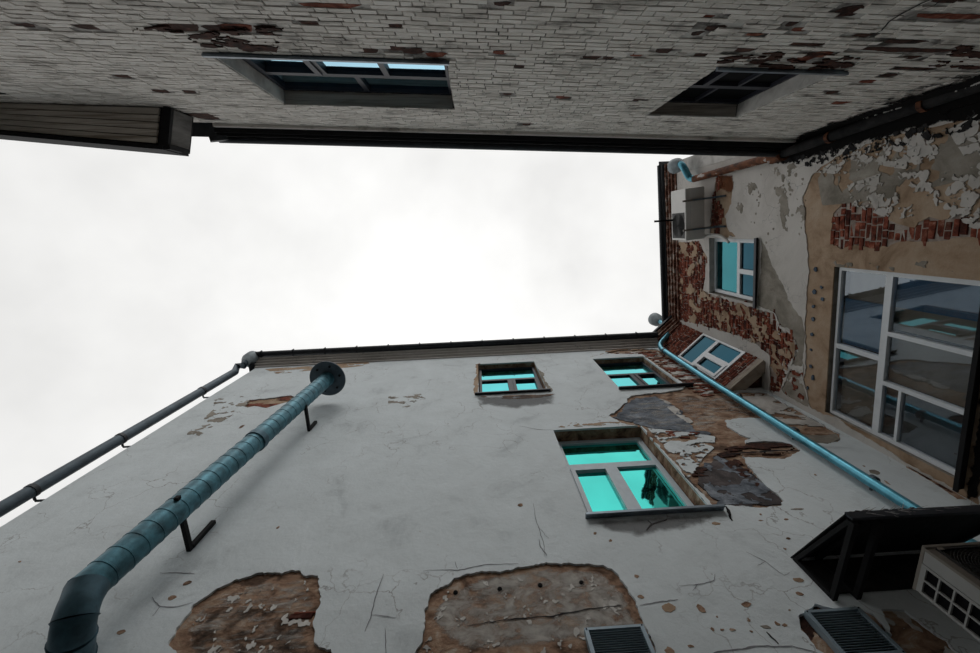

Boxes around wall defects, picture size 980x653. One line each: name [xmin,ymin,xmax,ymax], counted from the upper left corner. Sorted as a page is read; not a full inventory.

peeling [132,23,284,53]
spalling [361,46,447,57]
spalling [691,15,727,36]
peeling [694,21,980,83]
spalling [835,5,864,17]
flaking render [560,110,980,521]
flaking render [169,572,331,653]
crack [365,577,395,649]
flaking render [416,564,675,653]